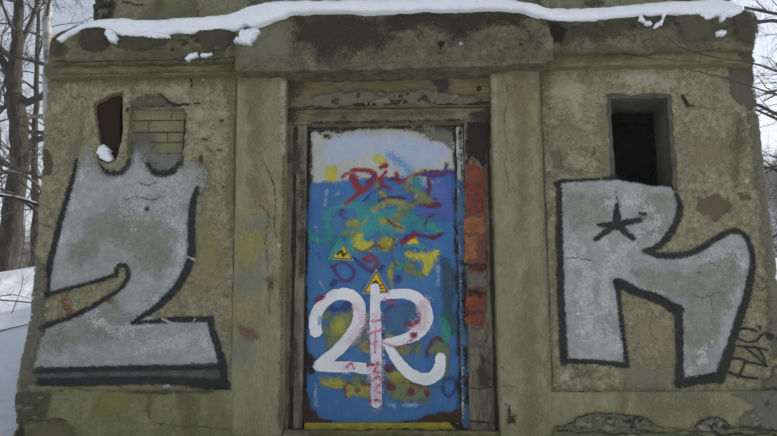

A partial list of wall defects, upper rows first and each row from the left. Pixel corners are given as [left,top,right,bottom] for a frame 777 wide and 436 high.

spalling [93,0,116,21]
damp [134,0,199,19]
spalling [124,79,234,164]
crack [260,162,276,271]
damp [39,11,642,436]
spalling [279,78,506,388]
damp [504,54,737,436]
spalling [573,411,665,436]